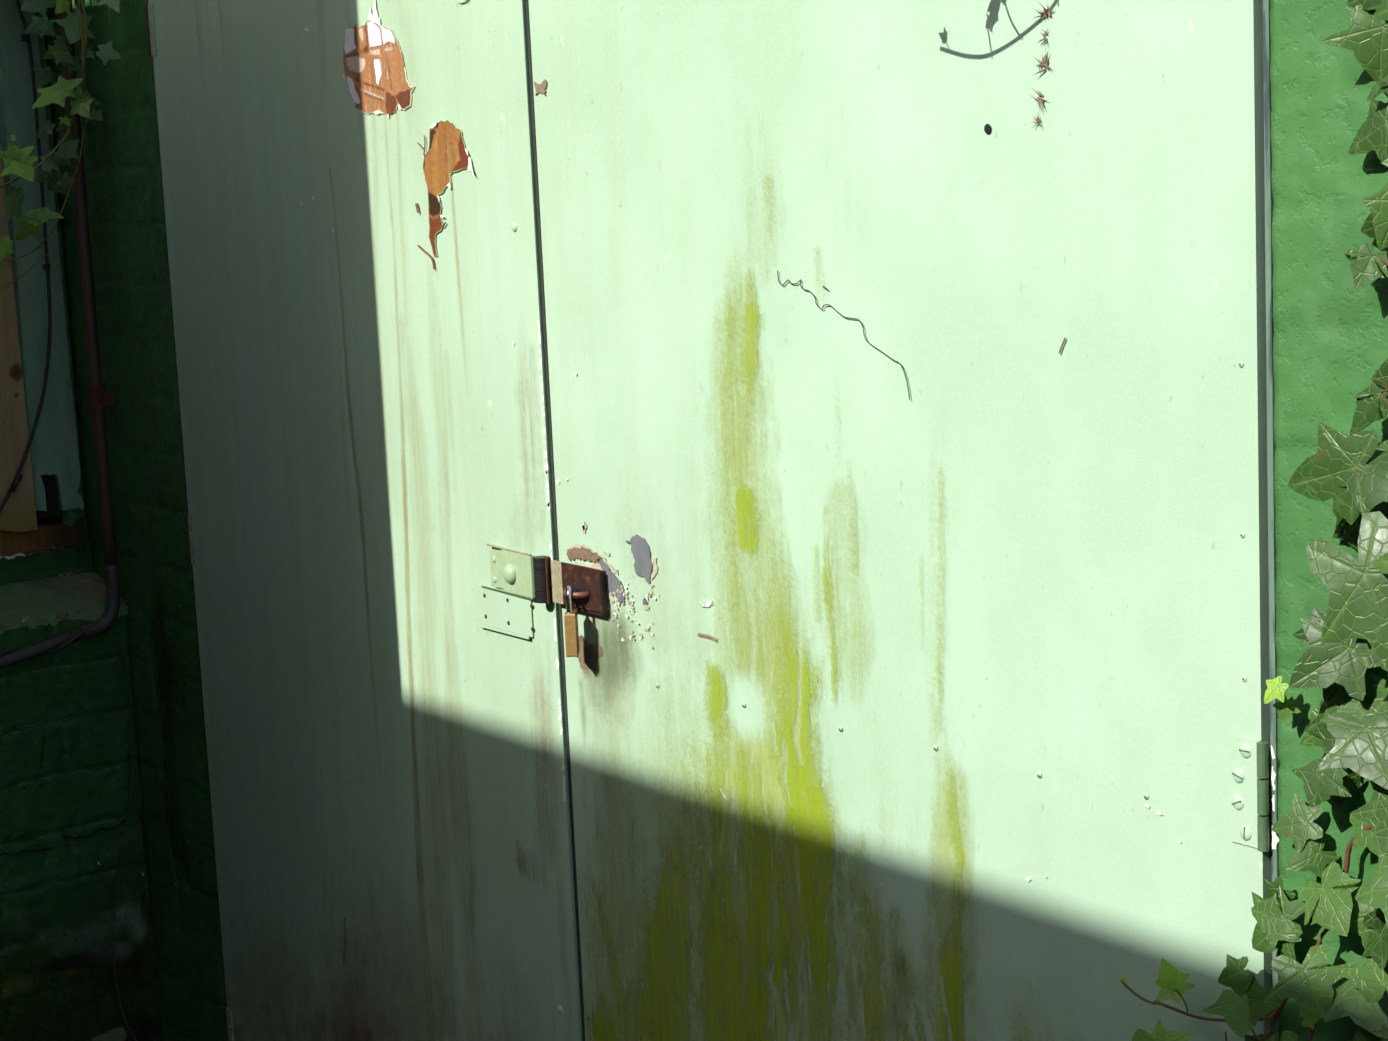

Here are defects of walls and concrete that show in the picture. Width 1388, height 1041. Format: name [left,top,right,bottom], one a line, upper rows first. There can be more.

peeling [342,0,415,118]
peeling [415,119,474,270]
crack [777,271,910,400]
peeling [537,319,568,510]
peeling [577,635,602,671]
peeling [549,522,659,649]
leakage [583,623,627,672]